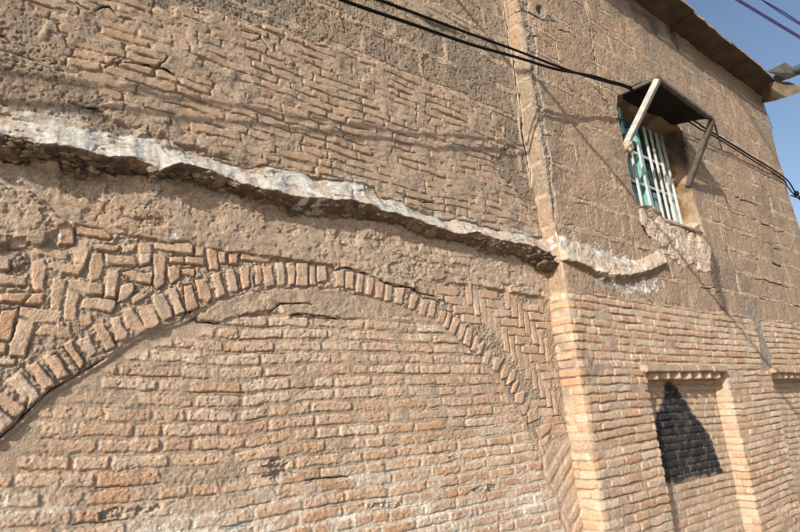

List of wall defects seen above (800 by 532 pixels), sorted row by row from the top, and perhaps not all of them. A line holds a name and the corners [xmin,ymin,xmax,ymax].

crack [107,57,172,75]
peeling [638,208,712,273]
spalling [9,254,33,276]
crack [335,267,440,304]
crack [270,302,335,319]
crack [0,359,104,438]